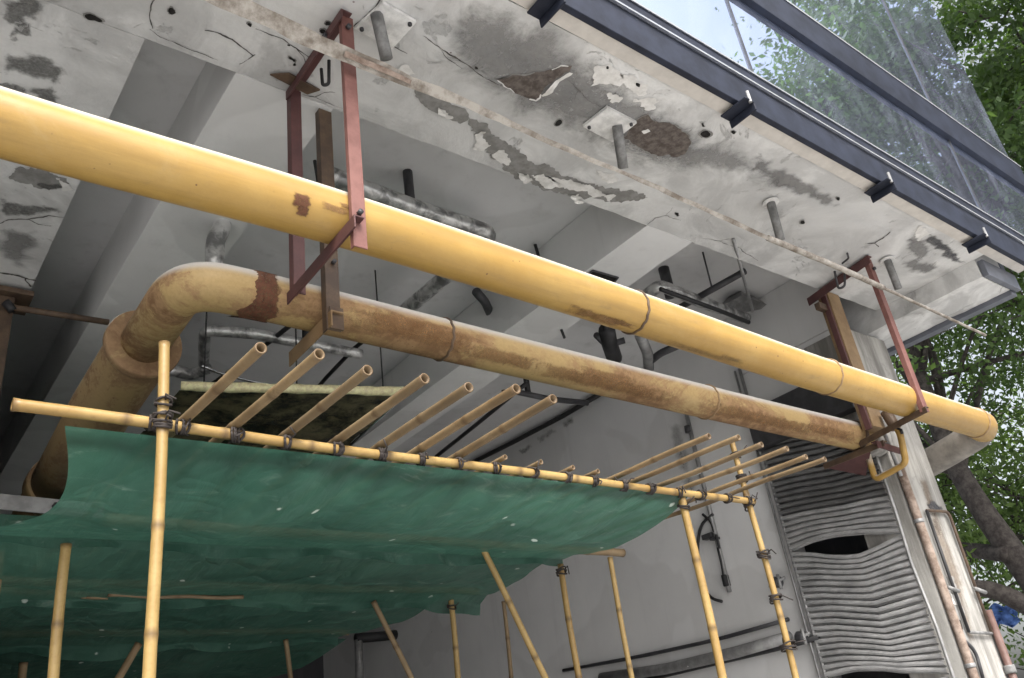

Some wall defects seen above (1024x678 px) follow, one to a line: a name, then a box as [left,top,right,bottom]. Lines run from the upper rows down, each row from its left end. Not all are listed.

damp [5,0,40,36]
crack [149,0,309,64]
damp [0,57,61,103]
spalling [496,65,573,101]
damp [458,15,662,123]
spalling [592,64,713,157]
peeling [414,90,647,204]
damp [624,131,741,169]
damp [756,162,832,204]
damp [4,233,33,264]